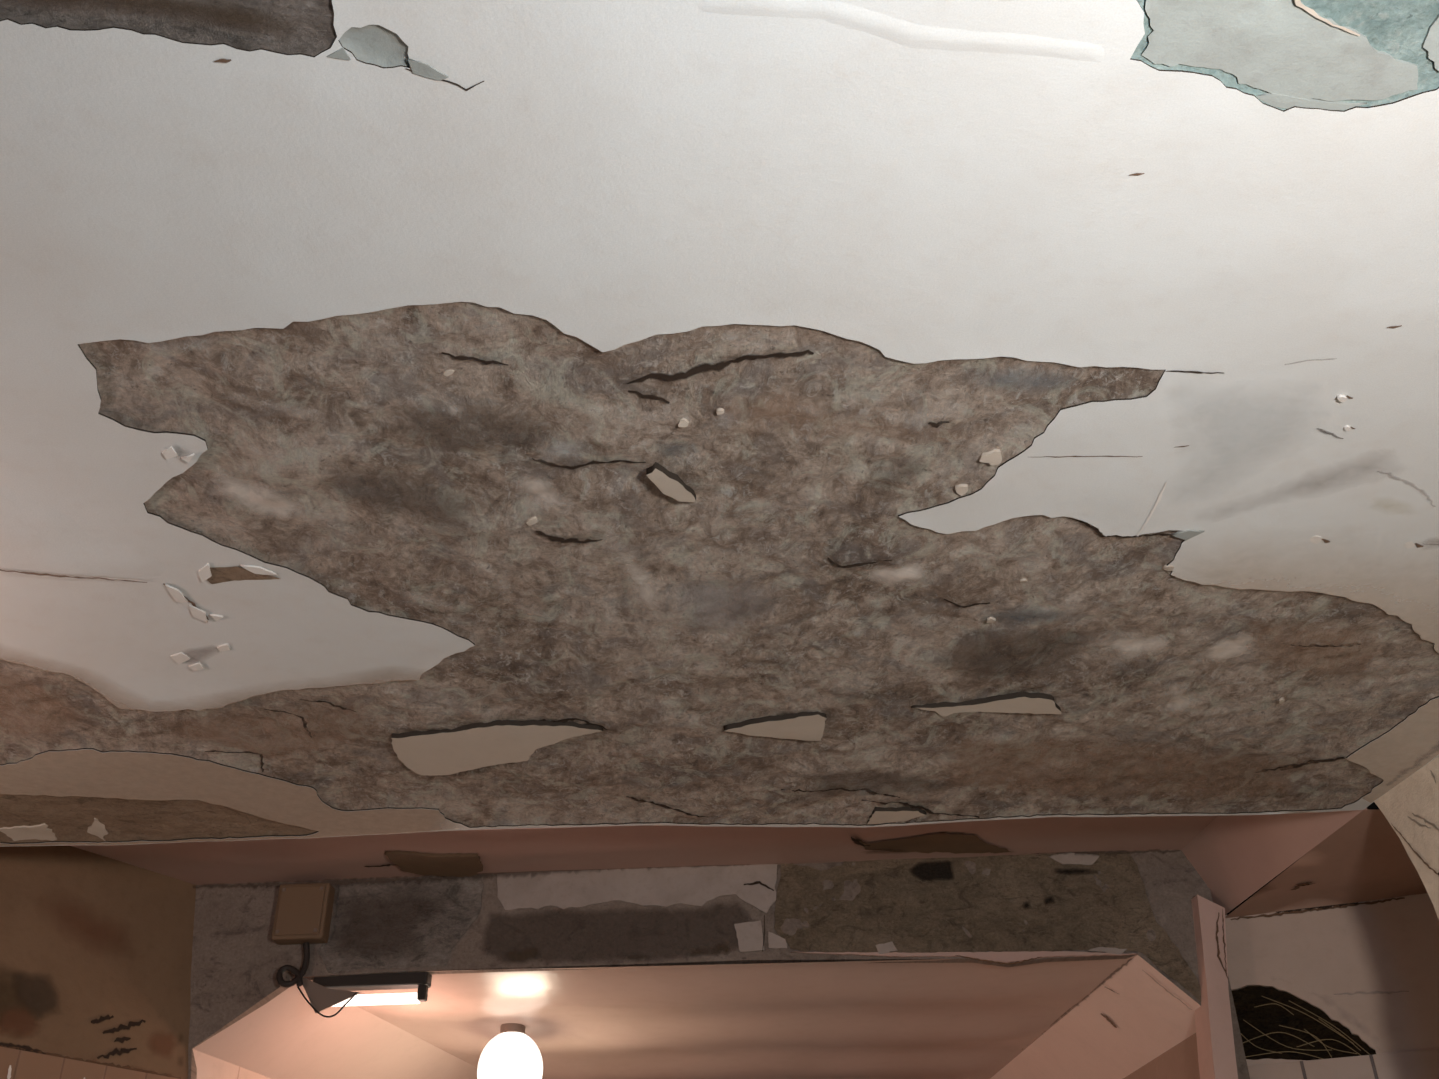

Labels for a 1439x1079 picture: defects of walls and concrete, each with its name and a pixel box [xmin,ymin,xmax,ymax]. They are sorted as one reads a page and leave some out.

spalling [0,0,484,91]
spalling [1131,0,1439,111]
spalling [0,302,1439,1001]